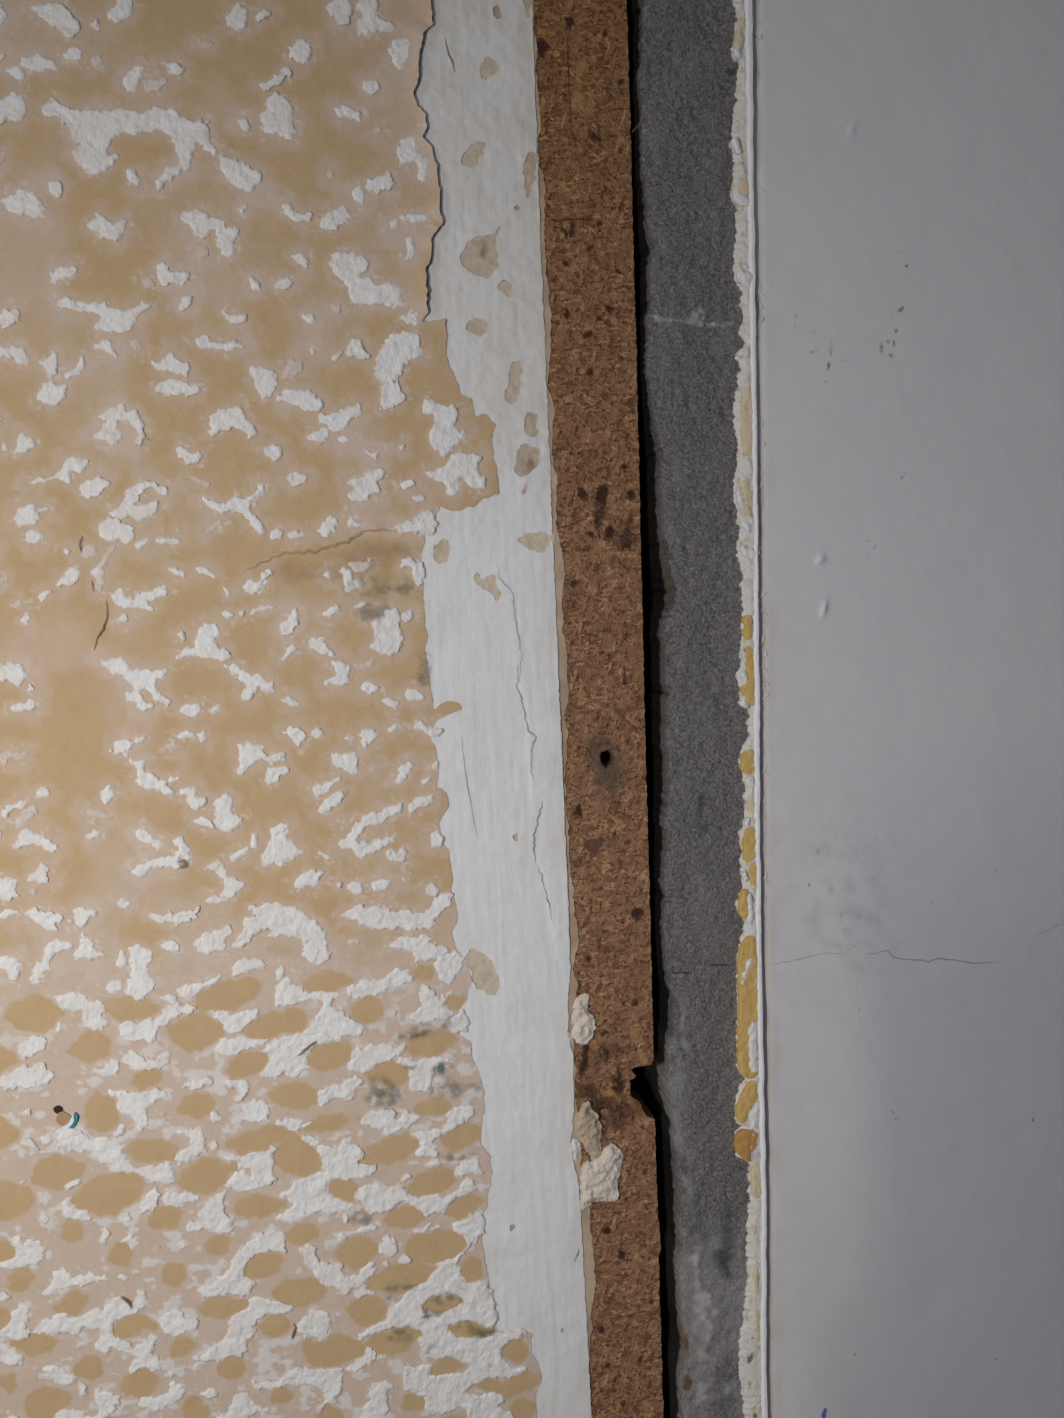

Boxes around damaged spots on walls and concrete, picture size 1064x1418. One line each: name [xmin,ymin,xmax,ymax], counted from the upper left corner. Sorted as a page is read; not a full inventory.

peeling [225,3,271,31]
peeling [326,0,410,69]
peeling [238,39,311,139]
peeling [0,0,262,406]
peeling [282,128,428,231]
peeling [390,213,429,261]
peeling [460,226,513,297]
peeling [2,432,36,455]
peeling [93,403,148,446]
peeling [174,251,488,586]
crack [533,816,550,904]
peeling [0,456,527,1418]